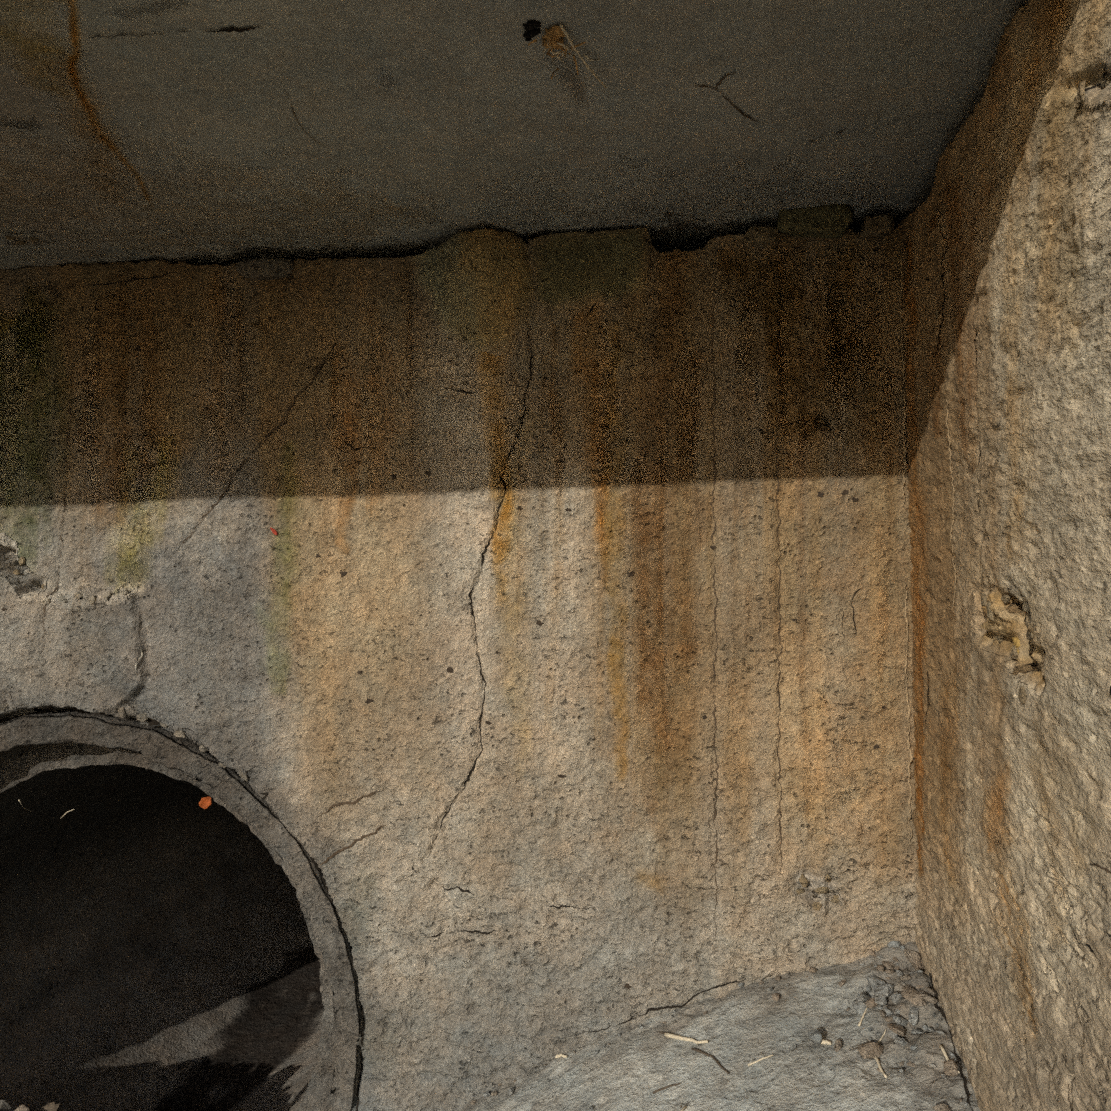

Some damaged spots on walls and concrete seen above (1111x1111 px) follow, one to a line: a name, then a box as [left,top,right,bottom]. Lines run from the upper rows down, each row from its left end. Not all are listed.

crack [173,343,336,555]
peeling [0,533,137,611]
crack [412,328,532,871]
damp [904,584,913,840]
spalling [973,582,1046,703]